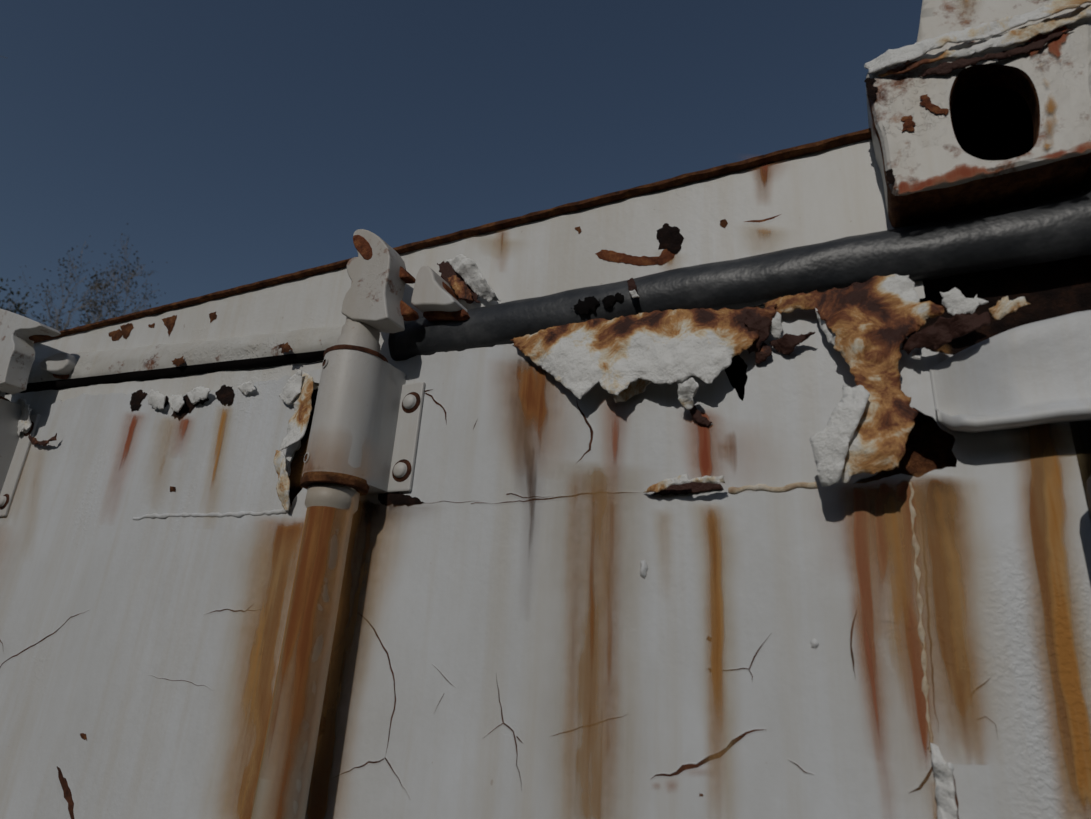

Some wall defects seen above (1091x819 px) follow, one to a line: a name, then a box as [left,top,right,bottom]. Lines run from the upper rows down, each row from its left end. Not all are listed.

peeling [864,0,1091,101]
corrosion [595,223,684,266]
peeling [130,381,256,421]
peeling [273,369,313,511]
crack [423,397,643,505]
peeling [511,274,1030,487]
corrosion [237,506,336,819]
crack [330,607,412,801]
crack [482,673,524,791]
crack [650,728,767,781]
corrosion [852,479,975,755]
corrosion [1027,423,1091,812]